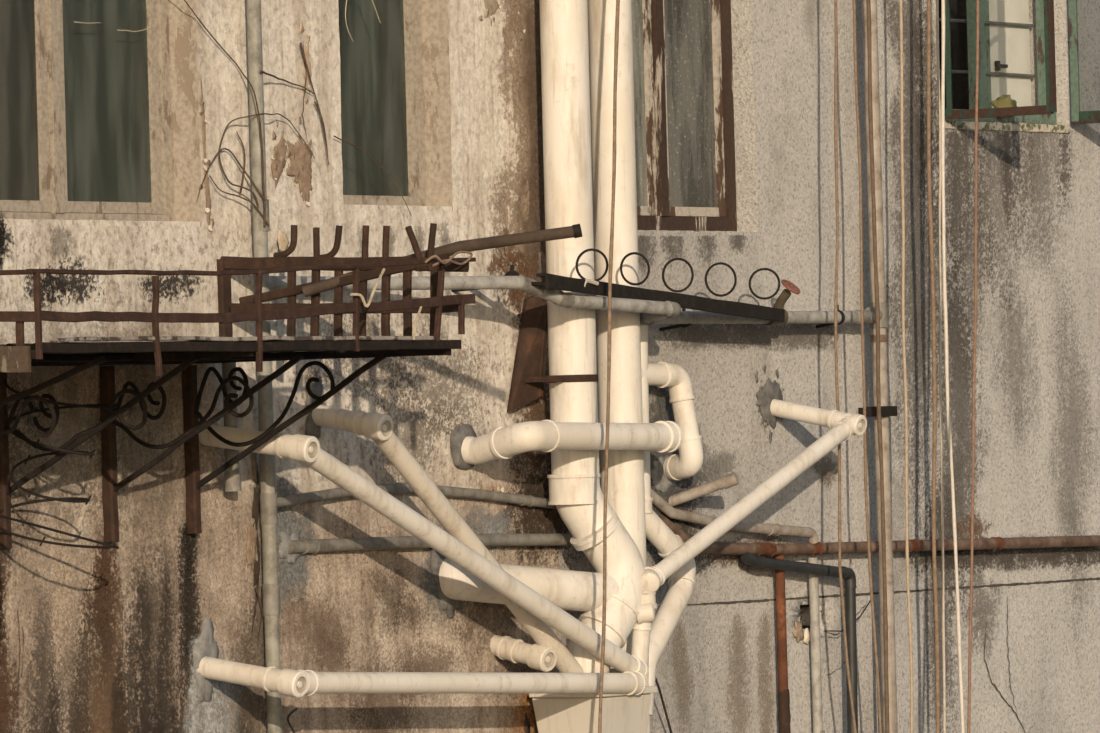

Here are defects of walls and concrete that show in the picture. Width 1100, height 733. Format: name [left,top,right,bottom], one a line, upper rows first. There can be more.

peeling [299,22,312,103]
peeling [271,116,314,206]
damp [488,0,546,282]
damp [998,131,1013,225]
damp [1060,133,1071,205]
damp [50,525,77,683]
damp [178,523,201,713]